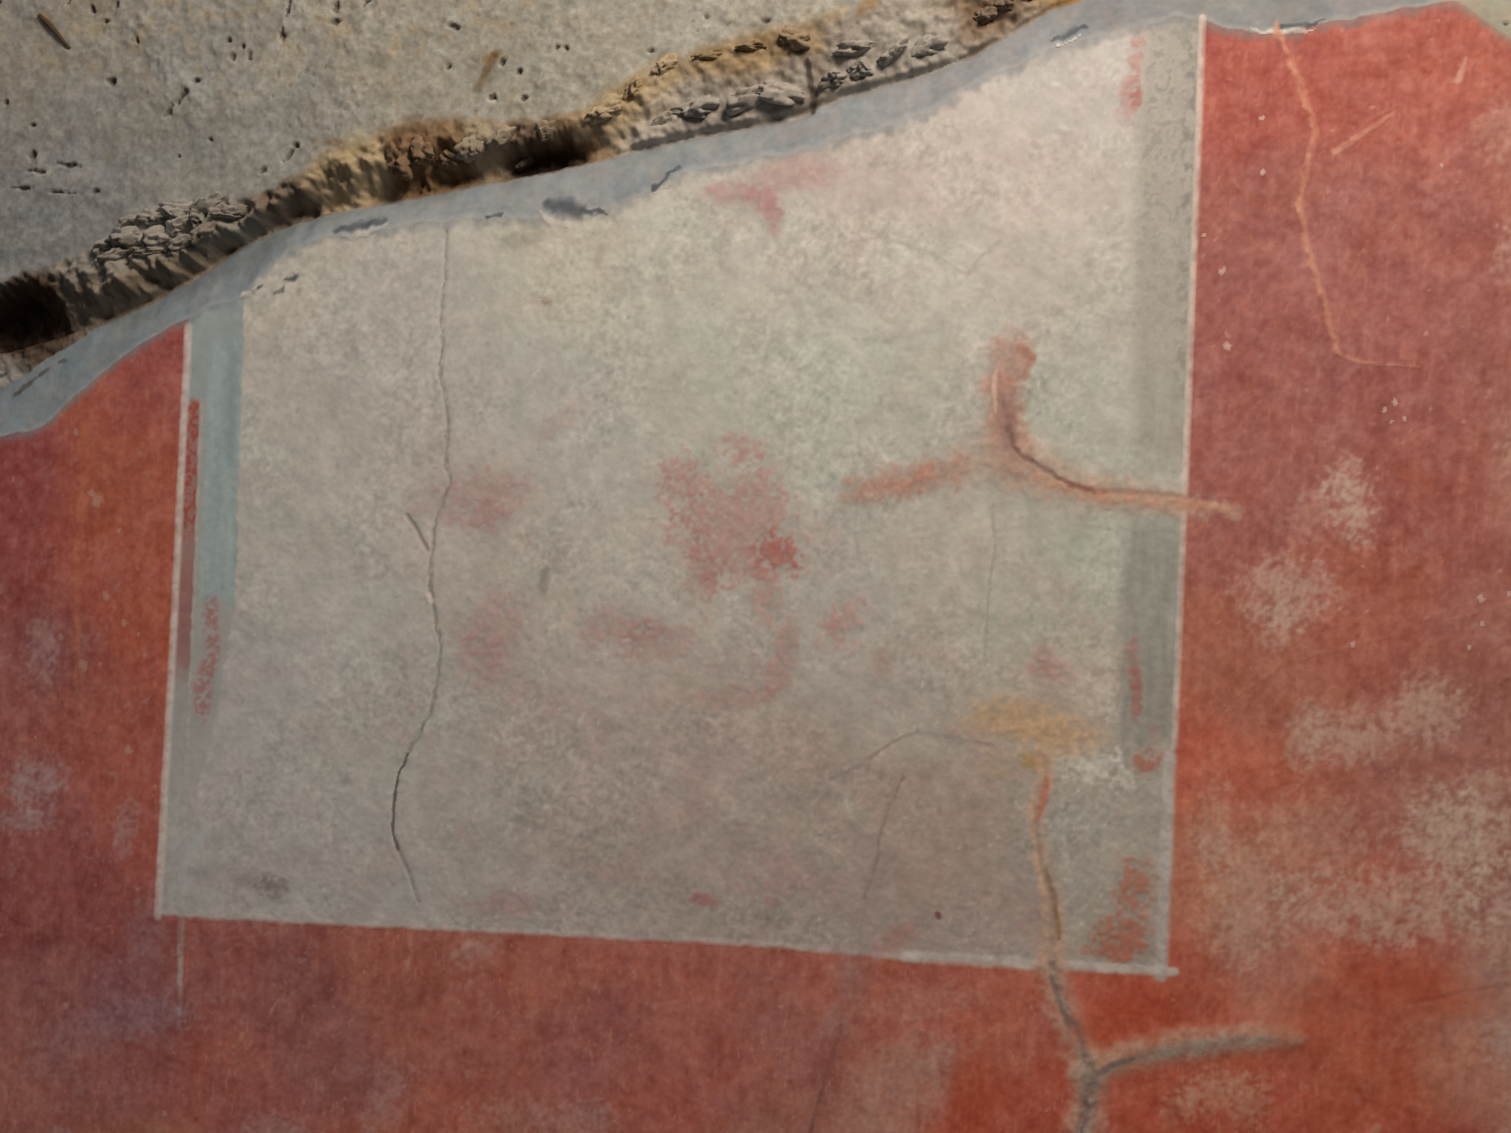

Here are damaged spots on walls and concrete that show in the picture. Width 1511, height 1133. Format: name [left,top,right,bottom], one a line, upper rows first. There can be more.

spalling [11,150,101,196]
spalling [89,0,120,25]
spalling [54,191,254,337]
spalling [164,78,200,119]
spalling [225,38,252,61]
spalling [259,0,1044,241]
spalling [1051,23,1089,47]
crack [1269,20,1420,369]
spalling [0,358,68,397]
crack [828,315,1249,667]
crack [390,229,453,902]
crack [828,728,1276,1133]